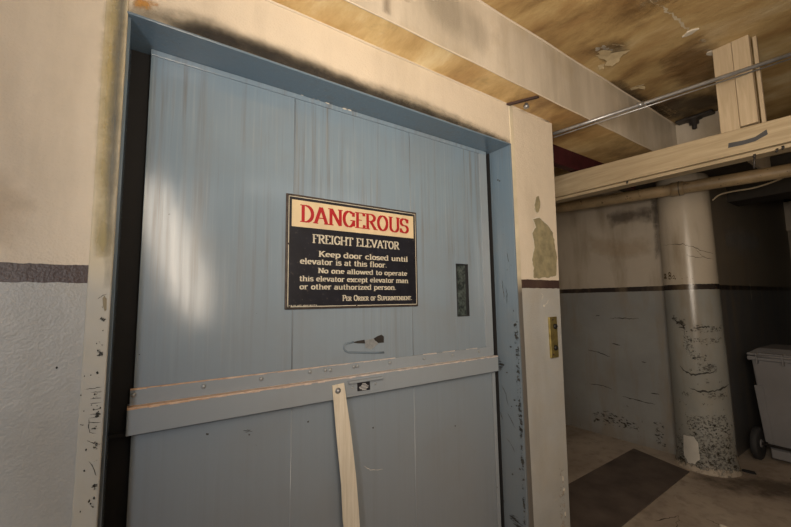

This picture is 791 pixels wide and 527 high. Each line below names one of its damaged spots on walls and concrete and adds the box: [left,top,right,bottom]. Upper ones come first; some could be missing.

crack [650,0,713,56]
peeling [595,44,630,70]
damp [97,0,124,251]
peeling [532,196,557,279]
peeling [675,432,743,478]